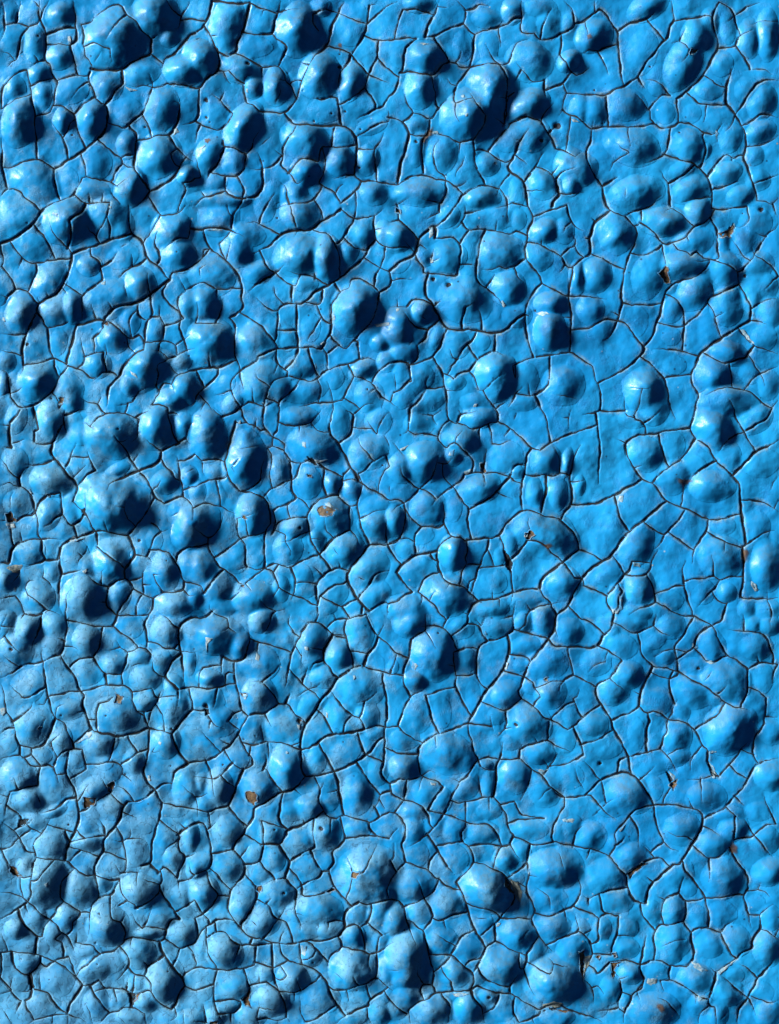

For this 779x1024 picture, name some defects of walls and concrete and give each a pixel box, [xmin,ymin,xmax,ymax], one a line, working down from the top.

peeling [718,224,735,239]
crack [0,1,535,490]
peeling [658,265,671,284]
peeling [317,501,337,518]
crack [164,0,779,1024]
crack [0,409,365,1024]
peeling [245,790,259,806]